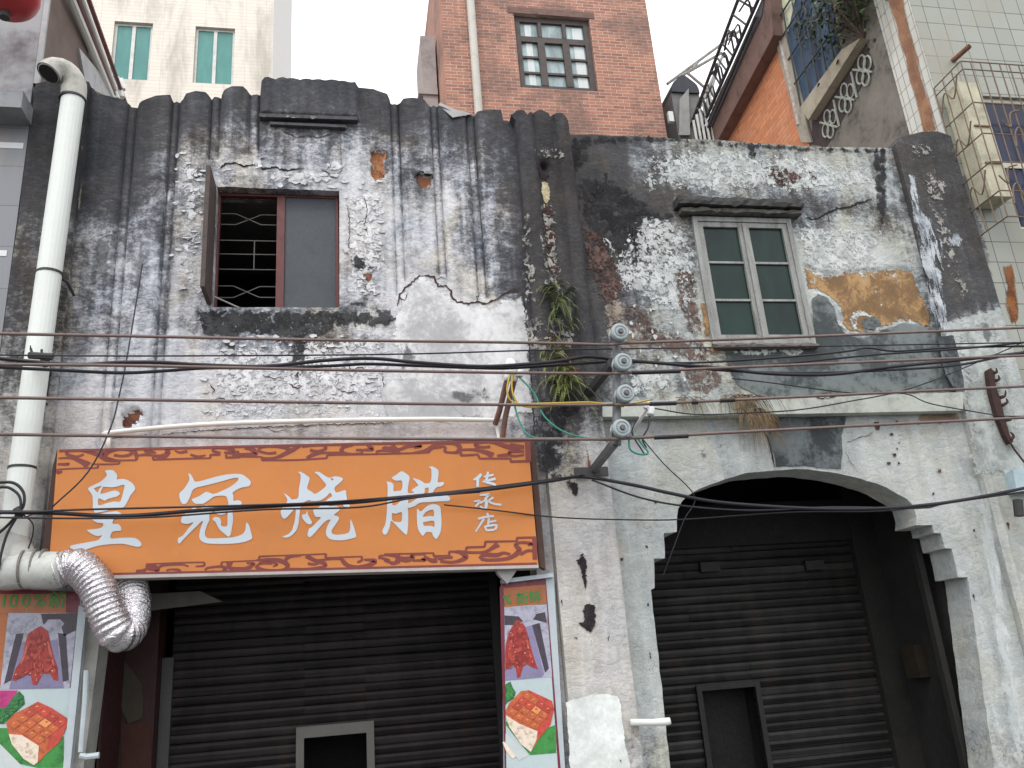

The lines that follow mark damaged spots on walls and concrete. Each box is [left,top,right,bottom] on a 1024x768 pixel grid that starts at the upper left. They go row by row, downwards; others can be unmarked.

crack [220,157,342,174]
peeling [200,333,391,422]
damp [197,301,396,380]
peeling [253,150,386,295]
damp [350,255,377,269]
crack [397,275,538,444]
peeling [581,216,722,395]
damp [572,135,887,265]
crack [804,199,871,222]
spalling [797,224,930,332]
damp [909,175,964,392]
rust [1003,265,1018,323]